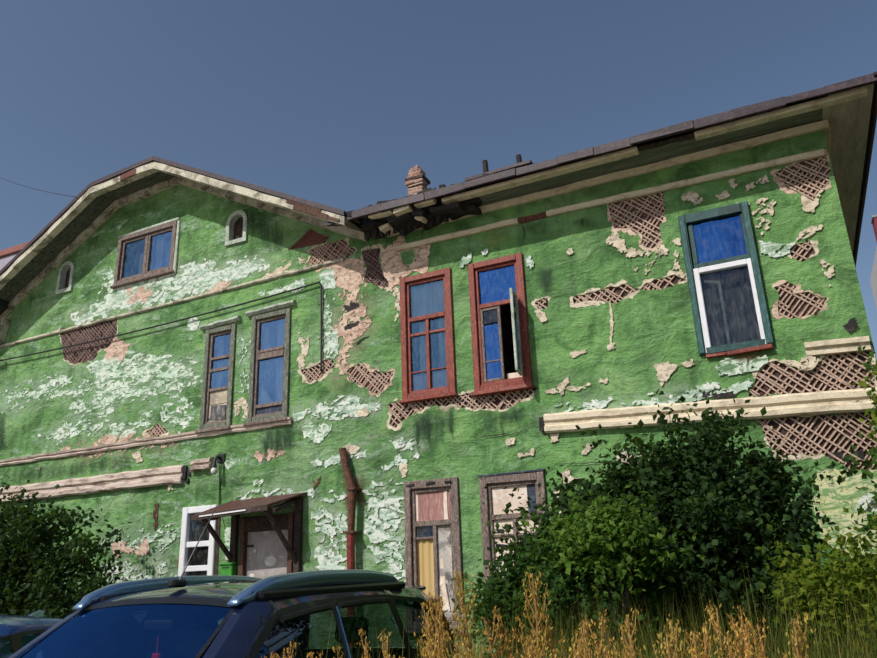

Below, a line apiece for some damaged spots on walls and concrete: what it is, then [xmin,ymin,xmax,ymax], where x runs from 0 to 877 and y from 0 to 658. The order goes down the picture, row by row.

flaking render [716,149,831,213]
flaking render [570,192,687,308]
peeling [748,198,835,286]
flaking render [1,236,877,585]